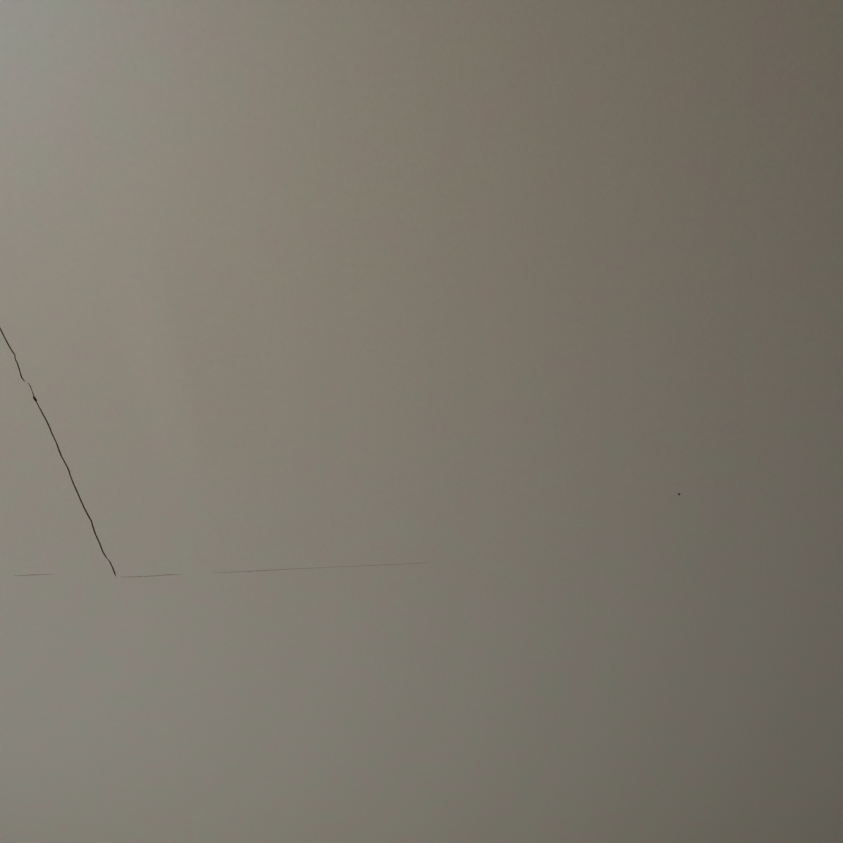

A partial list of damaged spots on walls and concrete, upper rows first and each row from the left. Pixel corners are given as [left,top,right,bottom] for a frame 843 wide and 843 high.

crack [0,328,179,577]